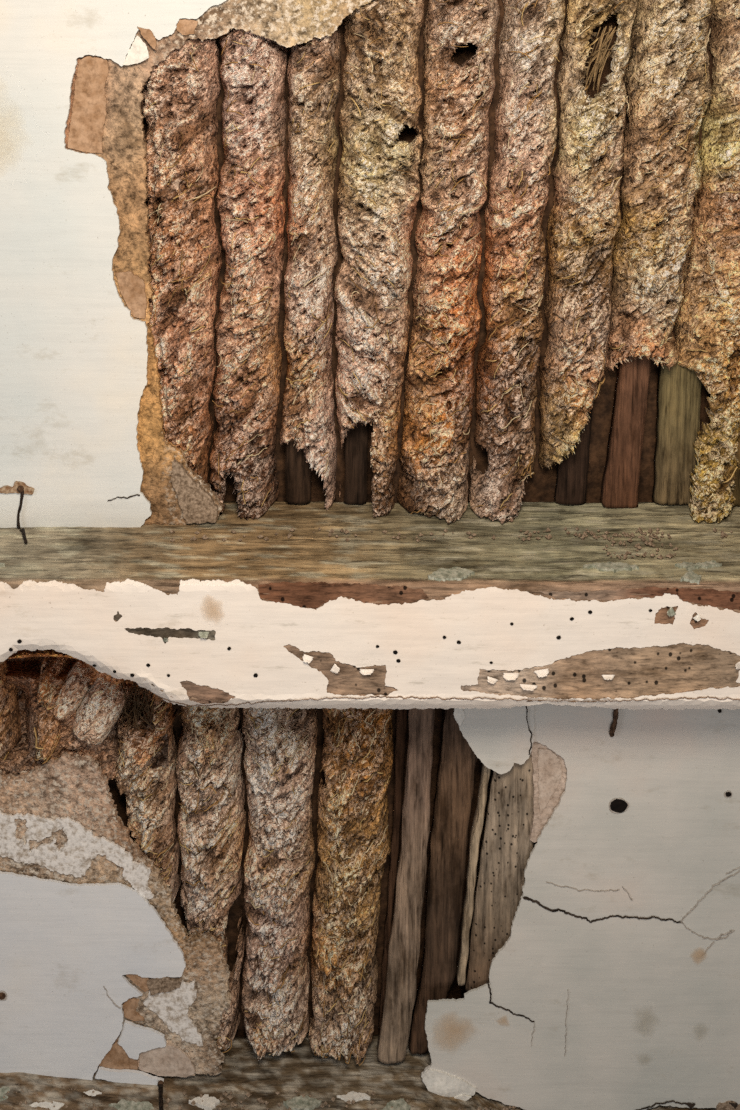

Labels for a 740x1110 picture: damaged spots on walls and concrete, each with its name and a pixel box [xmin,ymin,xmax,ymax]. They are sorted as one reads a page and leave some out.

spalling [65,0,371,525]
peeling [540,586,740,628]
peeling [180,681,235,704]
peeling [284,645,397,695]
peeling [454,643,740,843]
spalling [0,751,231,1085]
crack [523,867,740,958]
crack [487,981,535,1046]